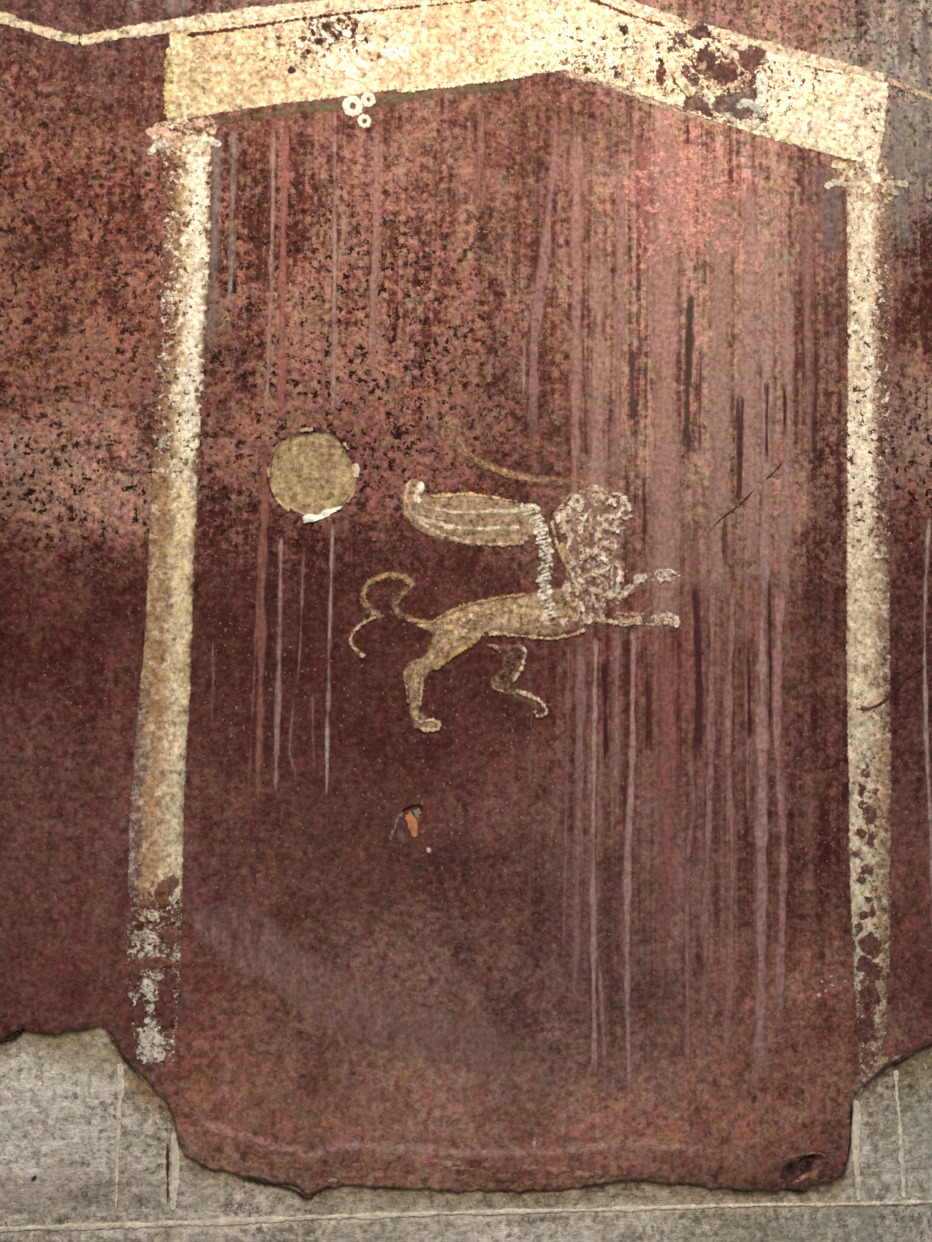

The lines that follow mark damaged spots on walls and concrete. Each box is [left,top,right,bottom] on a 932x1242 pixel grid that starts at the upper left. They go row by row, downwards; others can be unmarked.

peeling [655,22,785,130]
spalling [389,804,423,842]
peeling [850,768,884,1044]
spalling [0,874,932,1242]